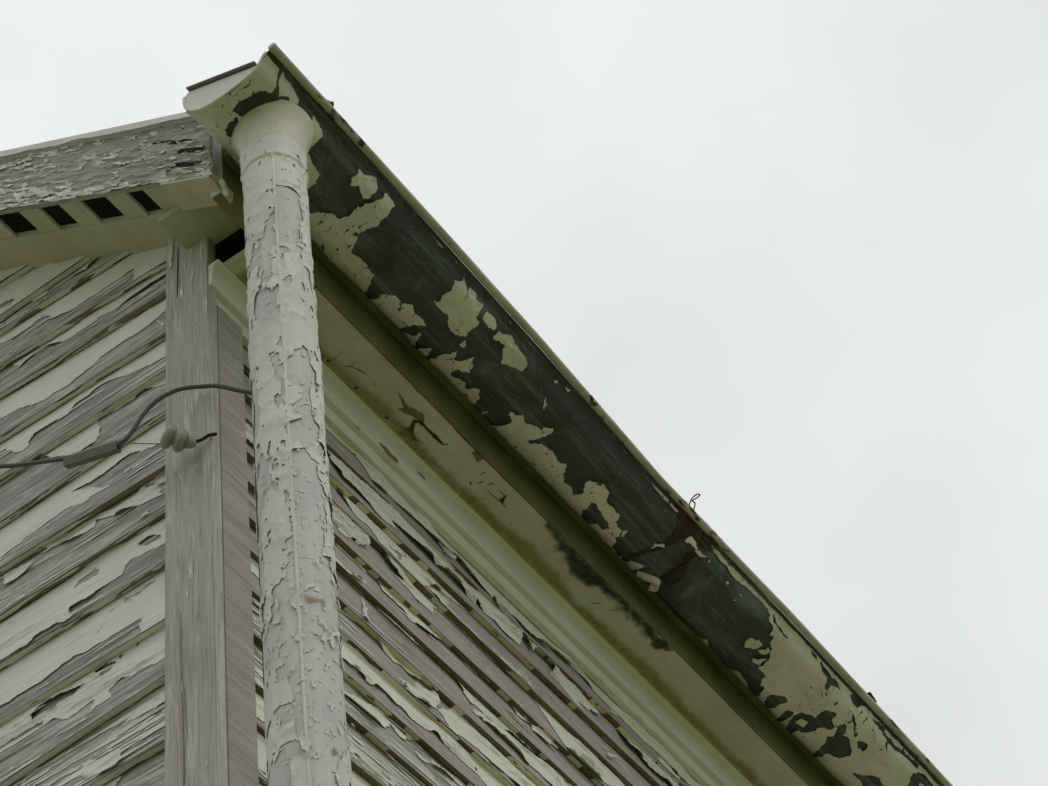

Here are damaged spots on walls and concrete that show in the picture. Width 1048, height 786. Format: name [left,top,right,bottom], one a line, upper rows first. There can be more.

peeling [0,121,212,210]
peeling [0,251,166,393]
peeling [0,311,166,521]
peeling [226,57,933,786]
peeling [0,444,165,614]
peeling [0,535,165,663]
corrosion [628,489,729,584]
peeling [0,619,165,786]